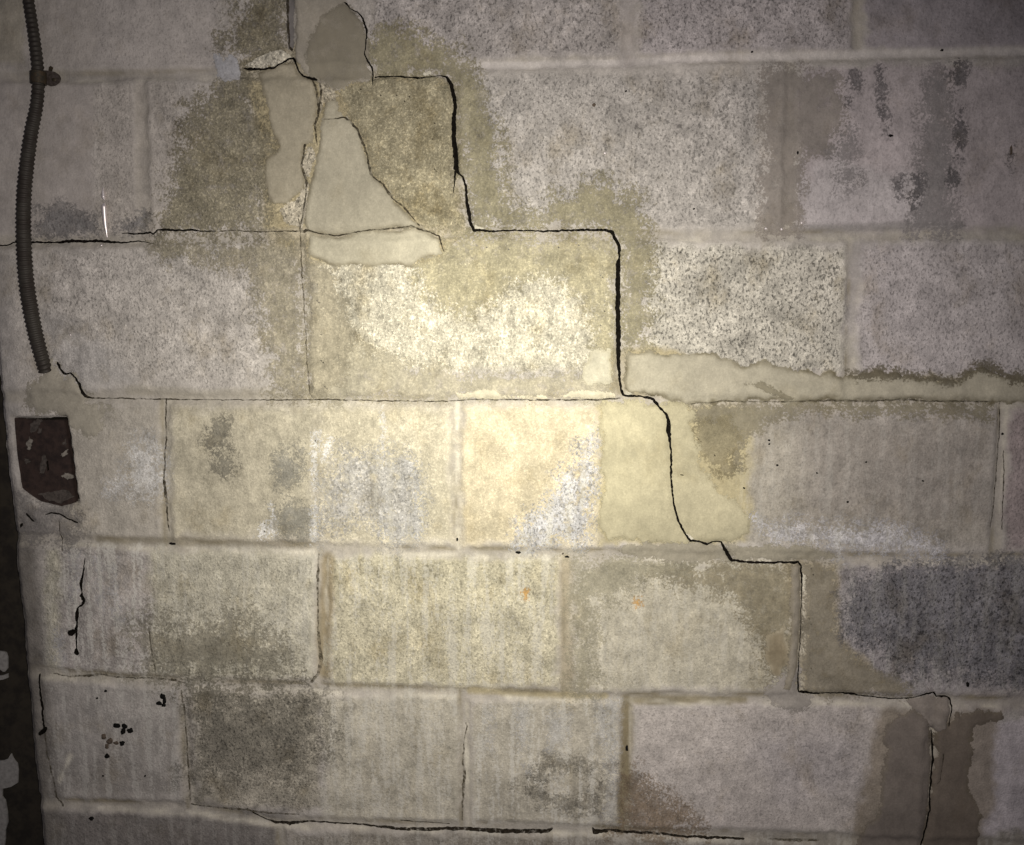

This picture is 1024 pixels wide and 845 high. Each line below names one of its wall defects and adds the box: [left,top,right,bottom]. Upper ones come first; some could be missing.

peeling [213,49,291,82]
spalling [280,147,317,231]
leakage [147,0,661,553]
crack [0,0,952,726]
leakage [755,61,864,241]
leakage [875,64,890,136]
leakage [893,60,970,242]
crack [692,398,1005,528]
crack [20,512,553,834]
leakage [507,425,1024,825]
crack [592,827,745,840]
crack [920,730,944,845]